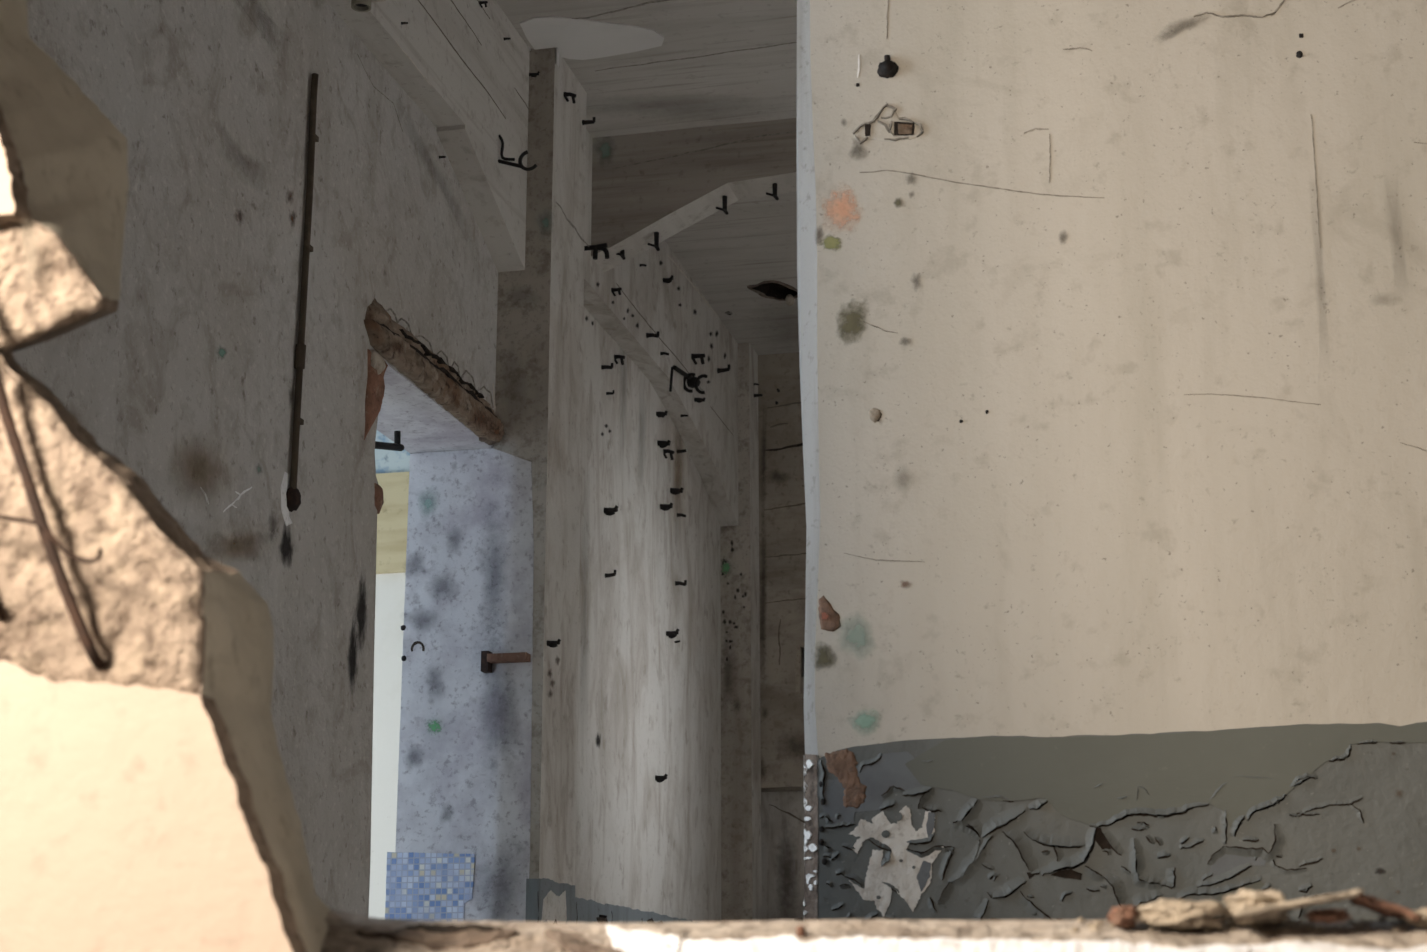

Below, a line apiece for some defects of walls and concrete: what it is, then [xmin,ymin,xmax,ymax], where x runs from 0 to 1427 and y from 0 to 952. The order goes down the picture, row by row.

crack [1311,116,1321,248]
spalling [364,349,388,440]
flaking render [365,298,495,415]
leakage [839,304,909,344]
spalling [0,218,206,694]
corrosion [825,748,867,808]
peeling [1329,739,1404,762]
peeling [541,752,1427,952]